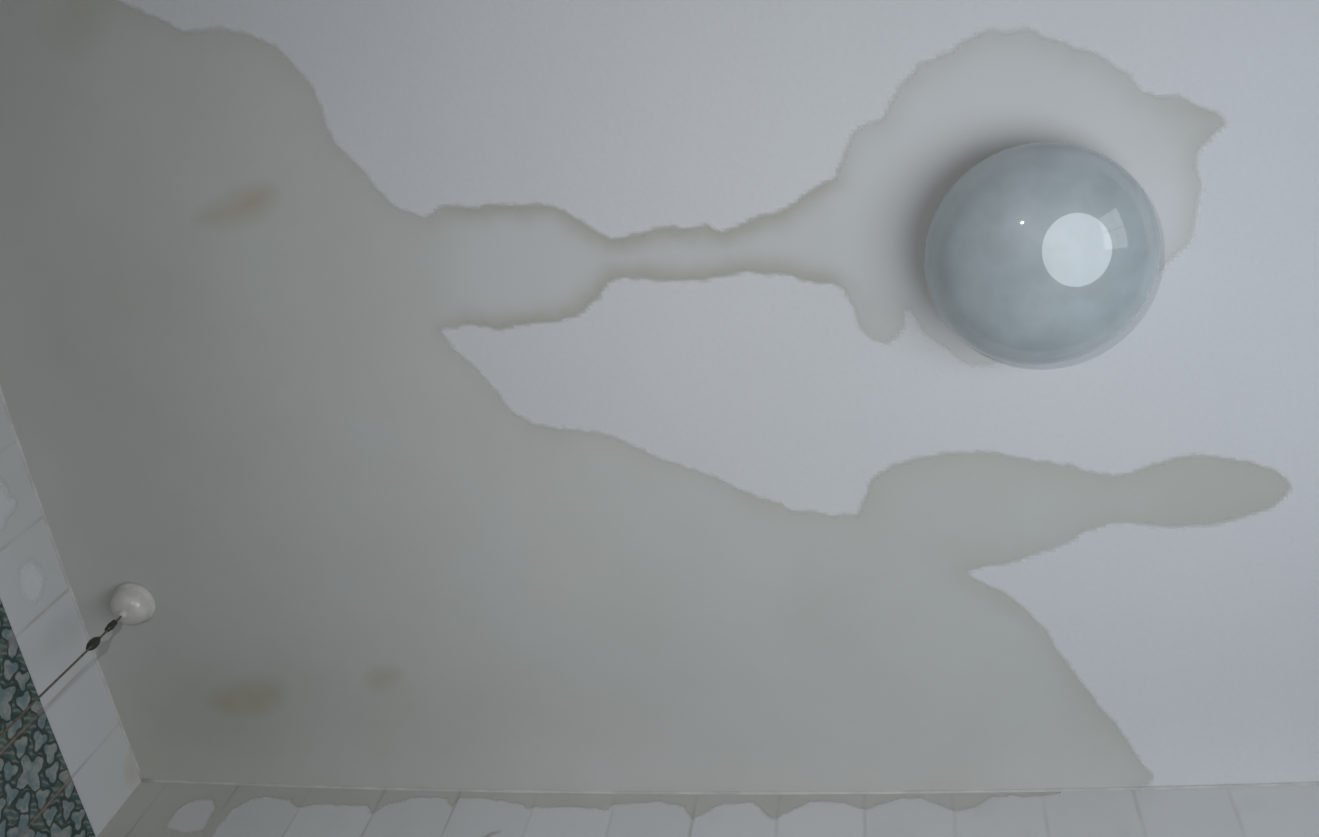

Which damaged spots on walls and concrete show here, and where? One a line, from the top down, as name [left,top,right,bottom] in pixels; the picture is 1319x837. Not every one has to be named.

water stain [425,169,843,336]
water stain [838,29,1225,365]
water stain [0,398,1059,837]
water stain [857,452,1290,572]